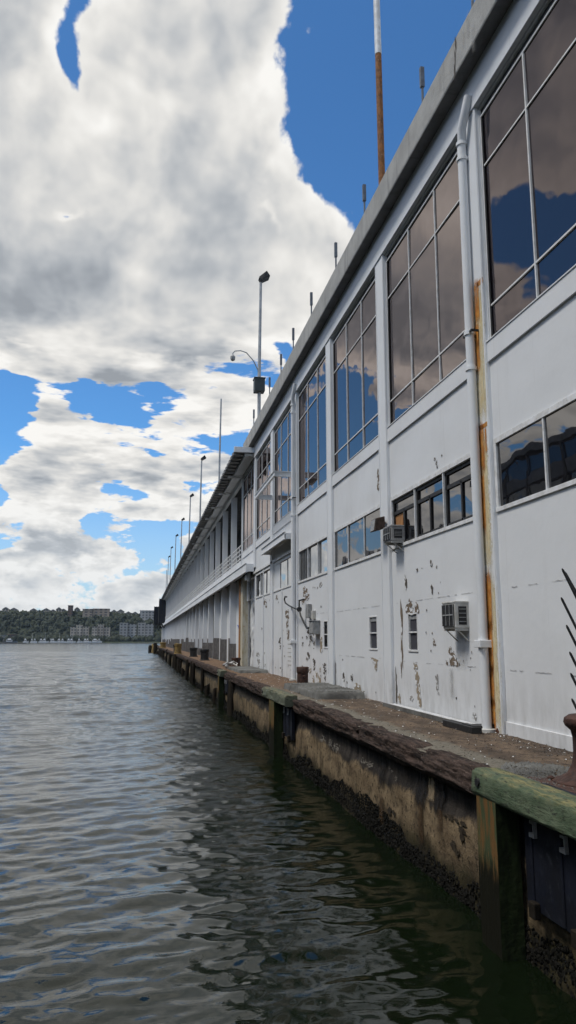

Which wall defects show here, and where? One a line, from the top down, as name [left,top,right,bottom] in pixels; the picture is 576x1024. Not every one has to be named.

rust [474,279,483,370]
rust [479,422,487,529]
peeling [256,573,291,671]
peeling [301,627,326,683]
peeling [398,560,437,708]
peeling [435,647,472,694]
rust [486,574,499,733]
water stain [415,772,445,842]